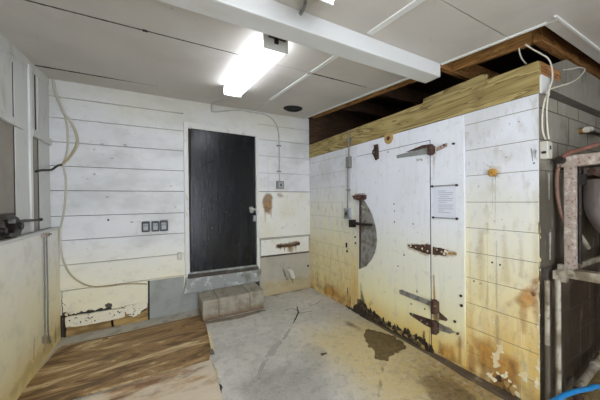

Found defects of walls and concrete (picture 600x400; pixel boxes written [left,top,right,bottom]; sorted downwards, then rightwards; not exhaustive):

rust [263,194,272,213]
peeling [65,302,148,317]
rust [518,290,535,306]
crack [258,302,319,378]
damp [364,329,406,361]
spalling [486,344,540,398]